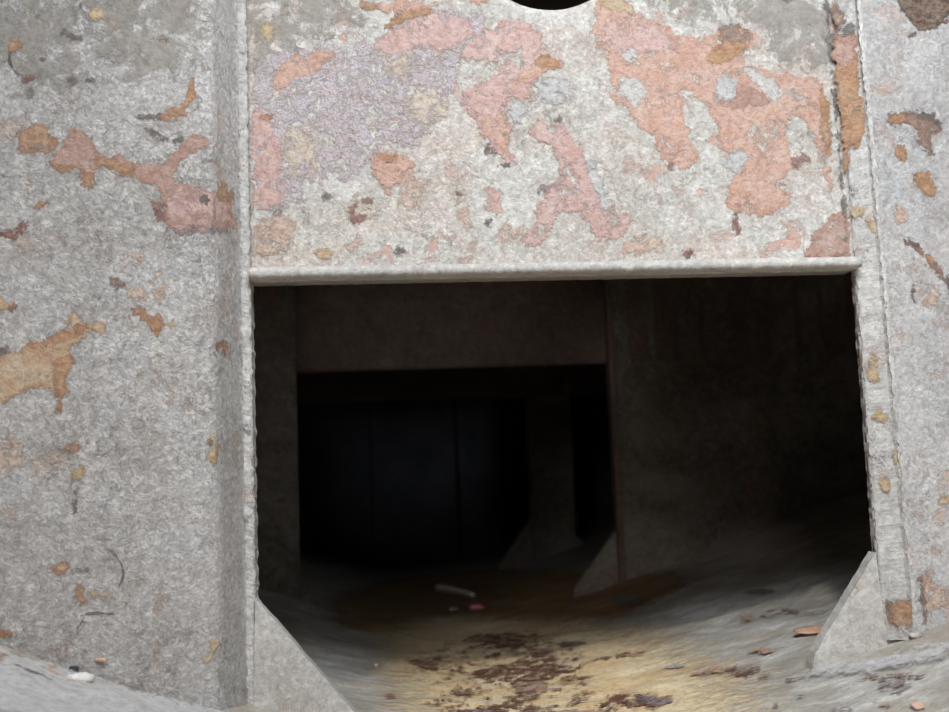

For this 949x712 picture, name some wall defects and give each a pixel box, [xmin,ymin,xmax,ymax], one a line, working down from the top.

peeling [49,125,237,243]
peeling [248,0,667,257]
peeling [590,0,834,217]
peeling [803,210,851,257]
corrosion [828,0,866,172]
corrosion [327,567,773,712]